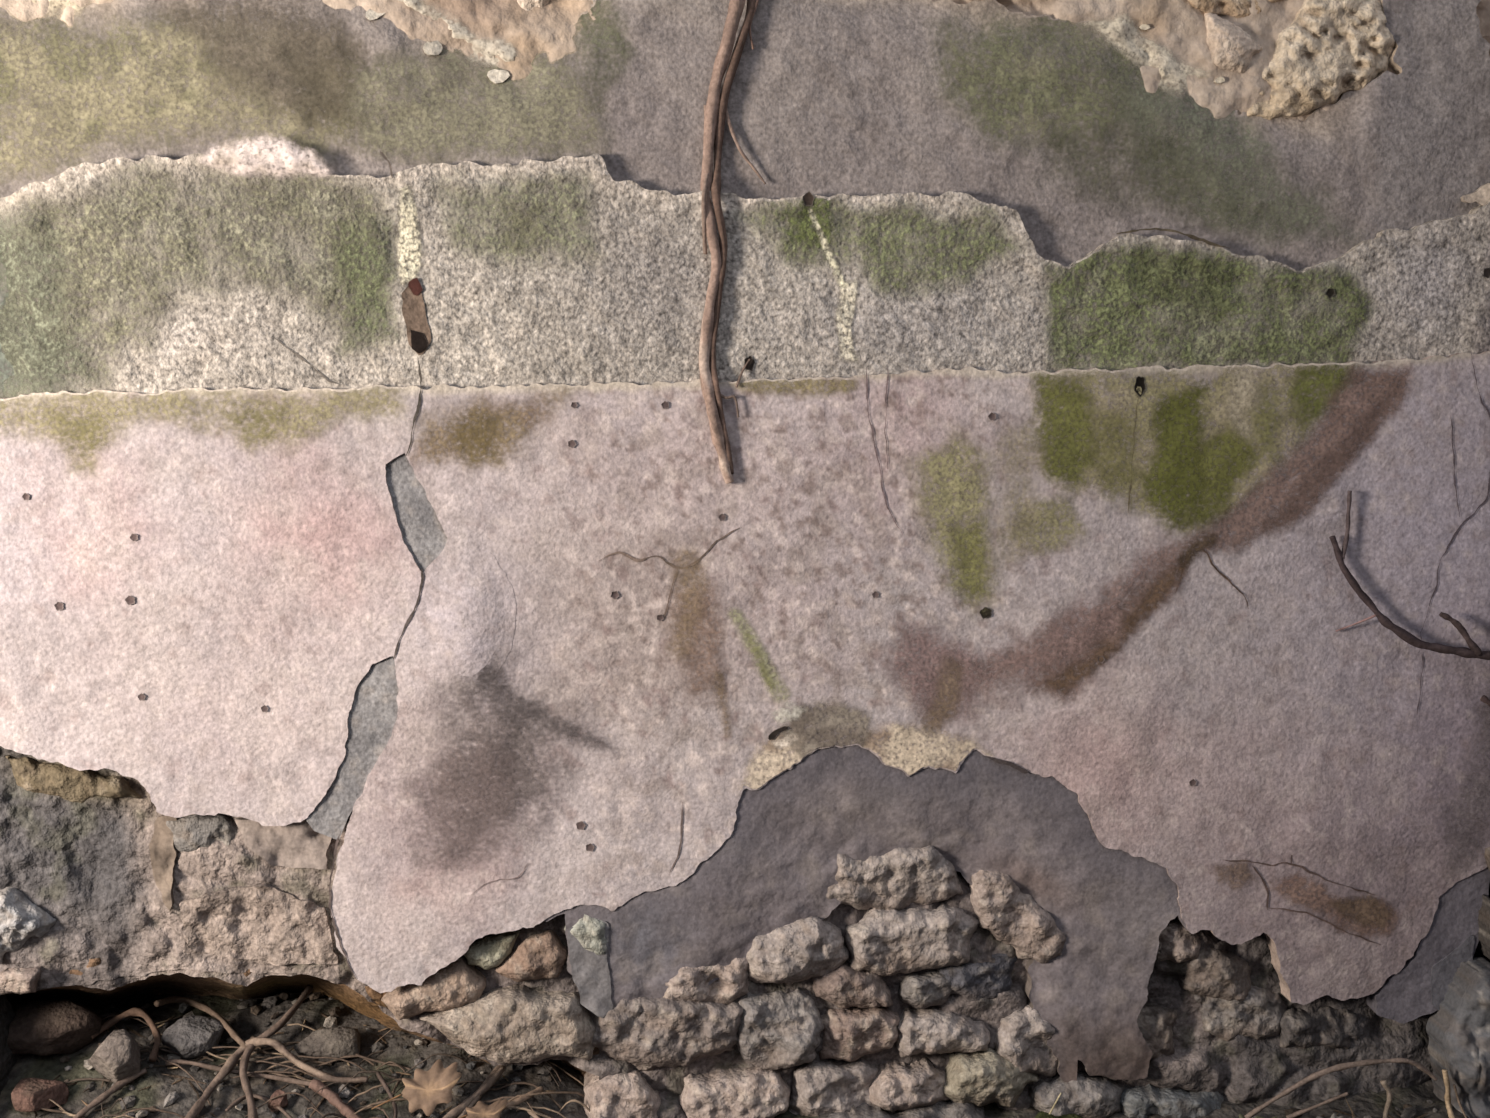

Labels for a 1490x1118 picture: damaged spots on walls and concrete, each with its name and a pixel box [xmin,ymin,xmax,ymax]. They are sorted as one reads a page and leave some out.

leakage [366,0,515,84]
efflorescence [201,137,328,176]
crack [380,151,393,178]
efflorescence [398,186,421,283]
crack [273,337,340,385]
leakage [1001,364,1349,526]
crack [1417,353,1490,714]
crack [306,277,448,978]
leakage [428,667,608,860]
flaking render [0,746,455,1046]
peeling [545,702,1187,1083]
crack [1225,855,1377,944]